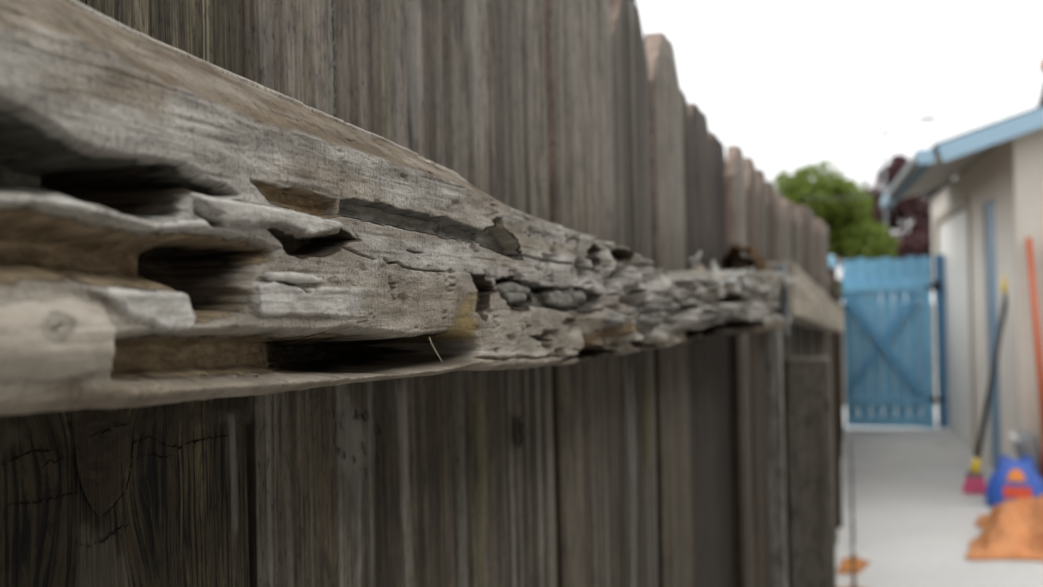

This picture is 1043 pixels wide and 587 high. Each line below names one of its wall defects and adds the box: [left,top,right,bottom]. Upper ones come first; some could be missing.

spalling [0,113,525,380]
spalling [584,241,634,270]
spalling [471,274,600,321]
spalling [688,244,803,336]
spalling [661,298,765,341]
spalling [562,342,617,366]
spalling [628,338,656,351]
crack [131,434,228,460]